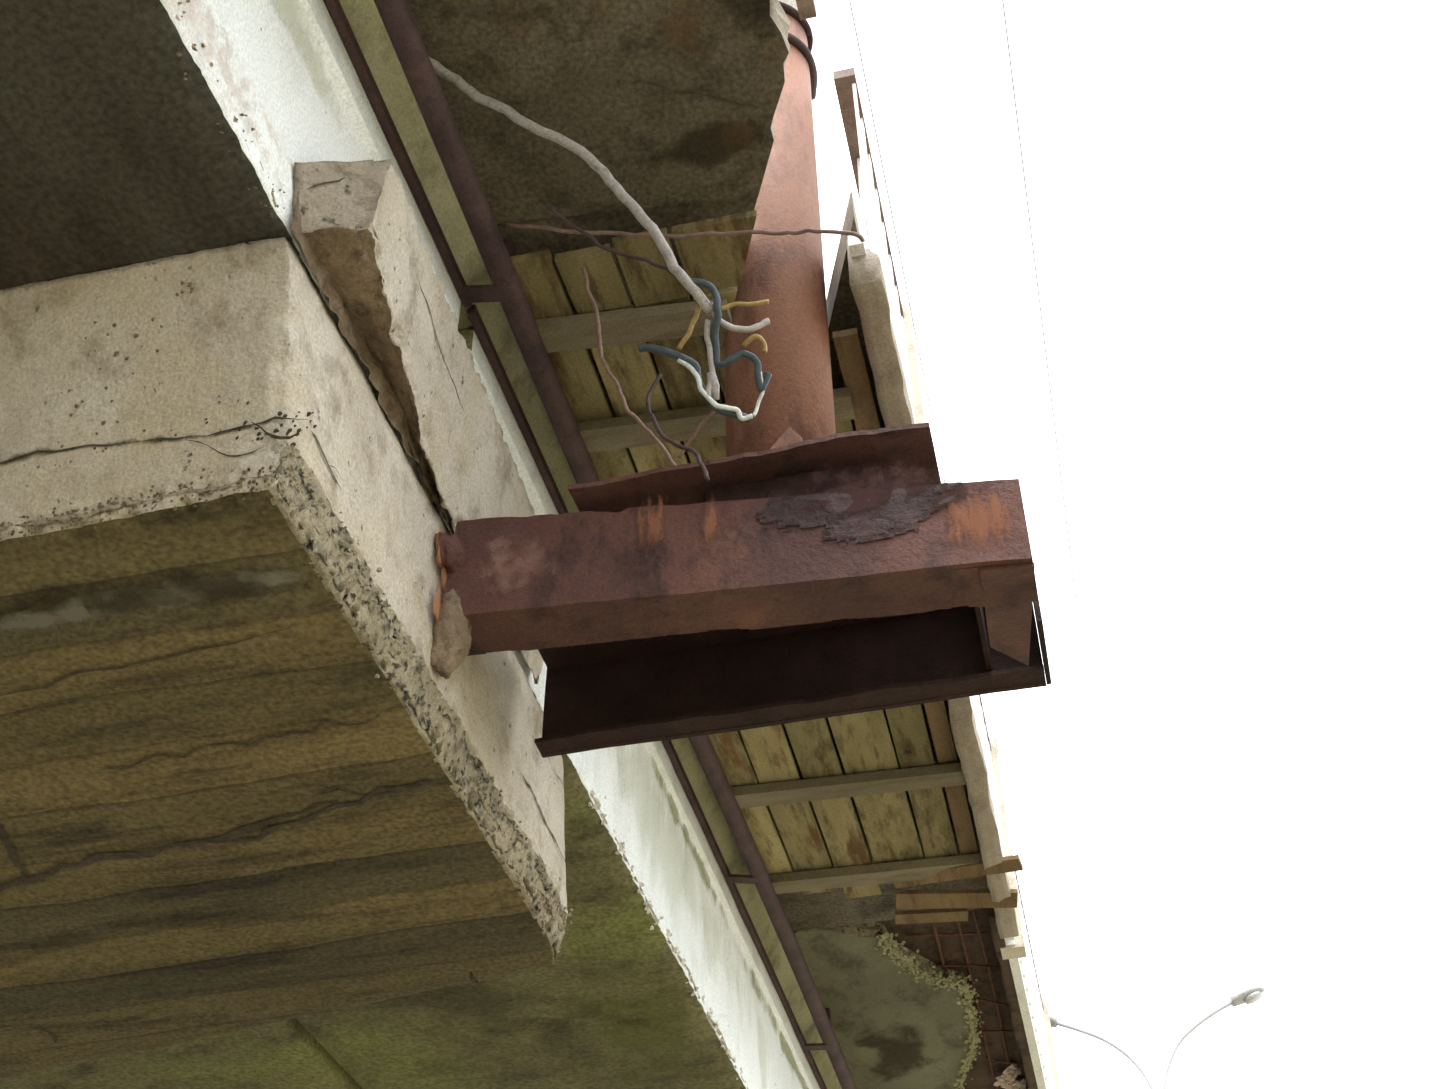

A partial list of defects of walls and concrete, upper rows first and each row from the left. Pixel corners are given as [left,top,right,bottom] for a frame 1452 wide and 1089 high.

crack [306,177,345,190]
leakage [654,122,762,164]
crack [415,272,464,411]
crack [0,401,343,491]
crack [402,425,452,535]
rust [756,463,1010,546]
leakage [0,571,298,629]
rust [433,547,447,621]
spalling [874,932,985,1089]
spalling [993,1064,1026,1089]